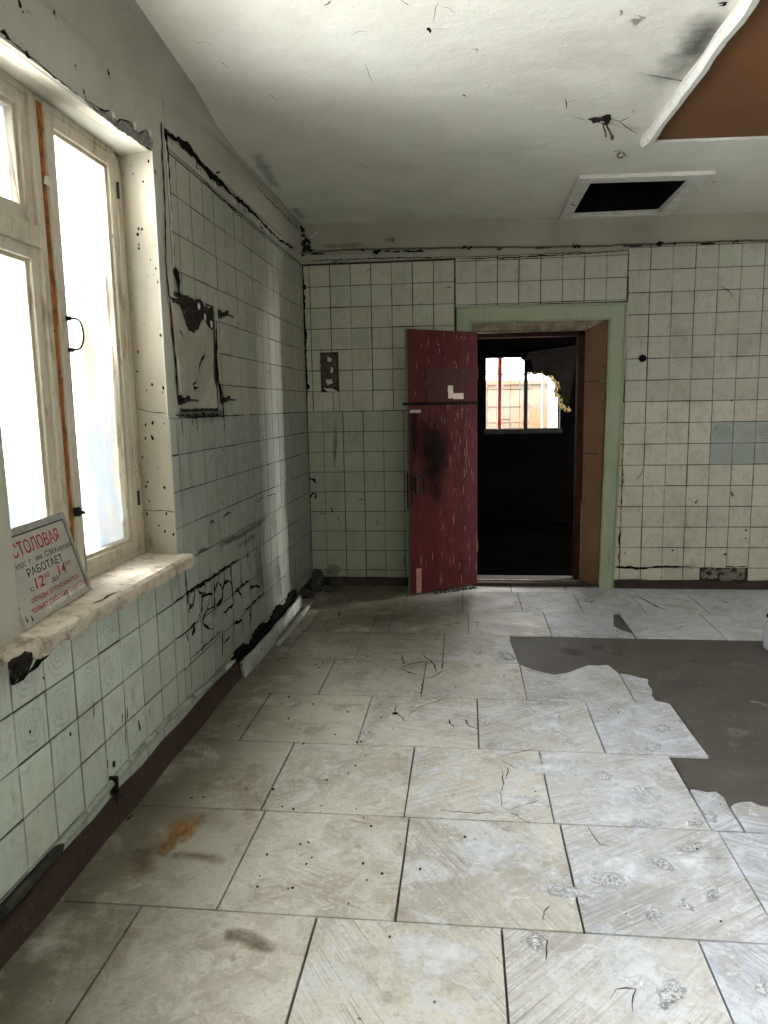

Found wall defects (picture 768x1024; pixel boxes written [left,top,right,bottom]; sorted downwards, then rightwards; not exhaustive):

flaking render [83,89,157,176]
flaking render [146,295,224,418]
peeling [700,553,748,581]
crack [175,559,264,659]
spalling [8,651,50,686]
crack [392,651,477,729]
crack [441,747,542,822]